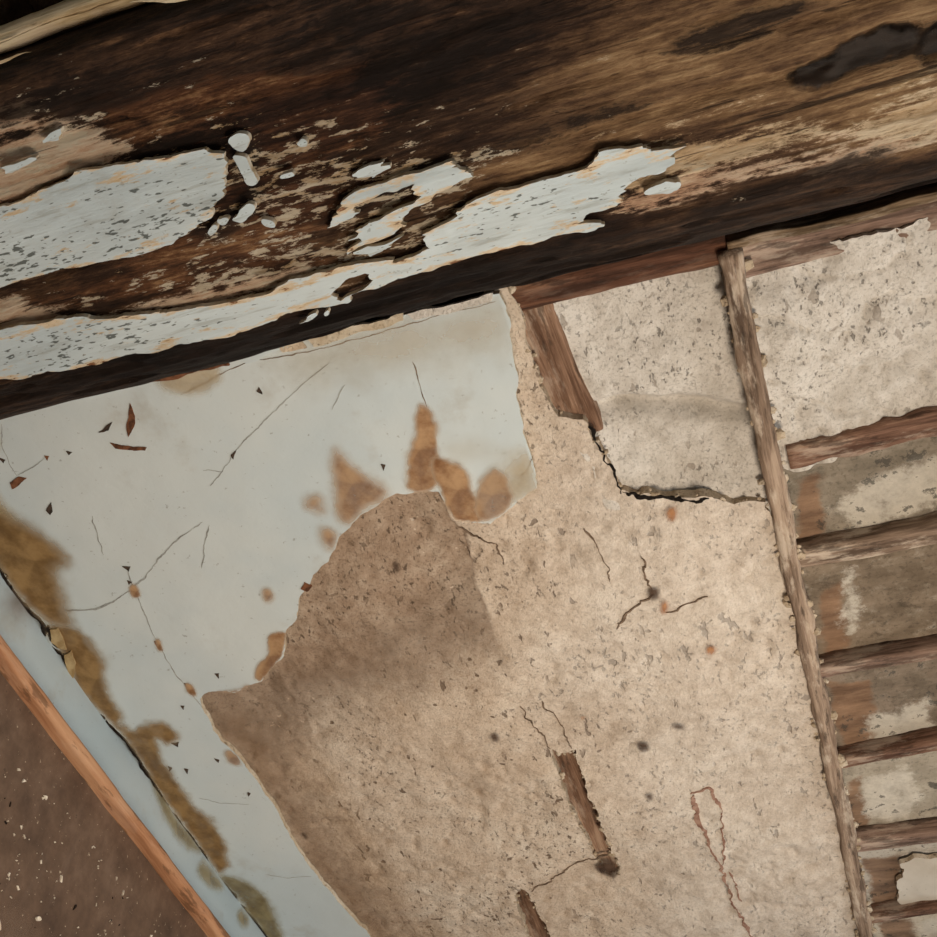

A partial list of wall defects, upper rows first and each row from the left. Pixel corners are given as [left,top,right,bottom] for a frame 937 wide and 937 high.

peeling [43,126,65,143]
peeling [0,130,686,380]
water stain [333,454,385,523]
water stain [407,405,532,522]
crack [588,426,709,504]
water stain [322,529,336,547]
flaking render [153,286,859,937]
water stain [0,505,286,937]
crack [520,701,572,749]
crack [532,854,608,892]
flaking render [895,853,937,905]